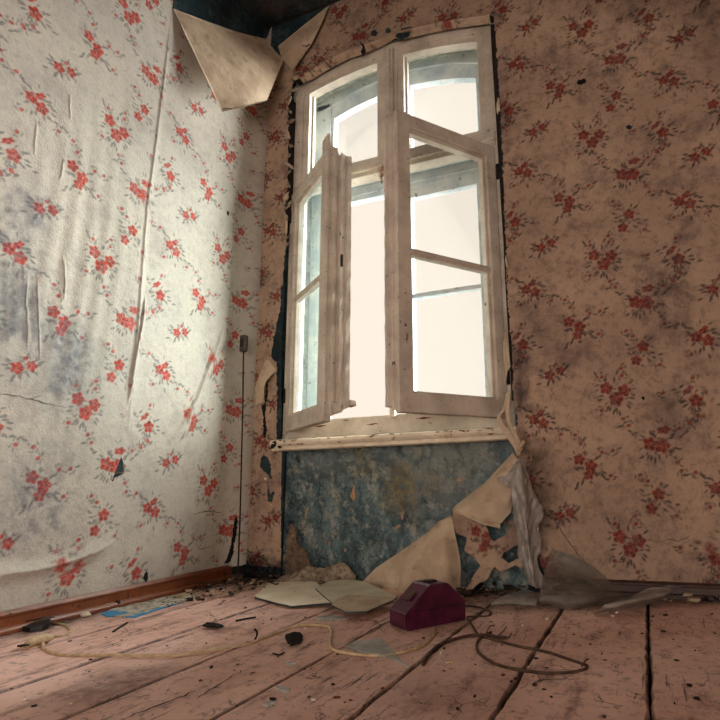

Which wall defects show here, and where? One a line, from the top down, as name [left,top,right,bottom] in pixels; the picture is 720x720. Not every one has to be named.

crack [4,394,66,408]